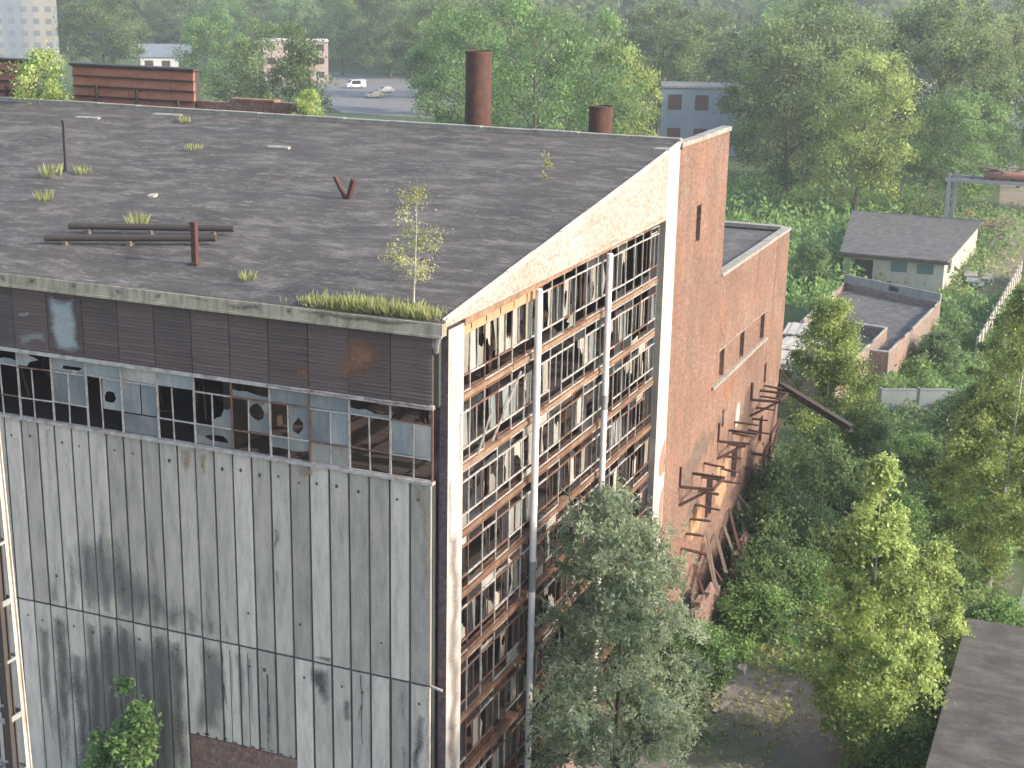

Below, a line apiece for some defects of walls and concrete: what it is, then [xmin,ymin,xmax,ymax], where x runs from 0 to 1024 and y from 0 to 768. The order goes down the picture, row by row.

peeling [50,300,76,349]
leakage [314,672,326,696]